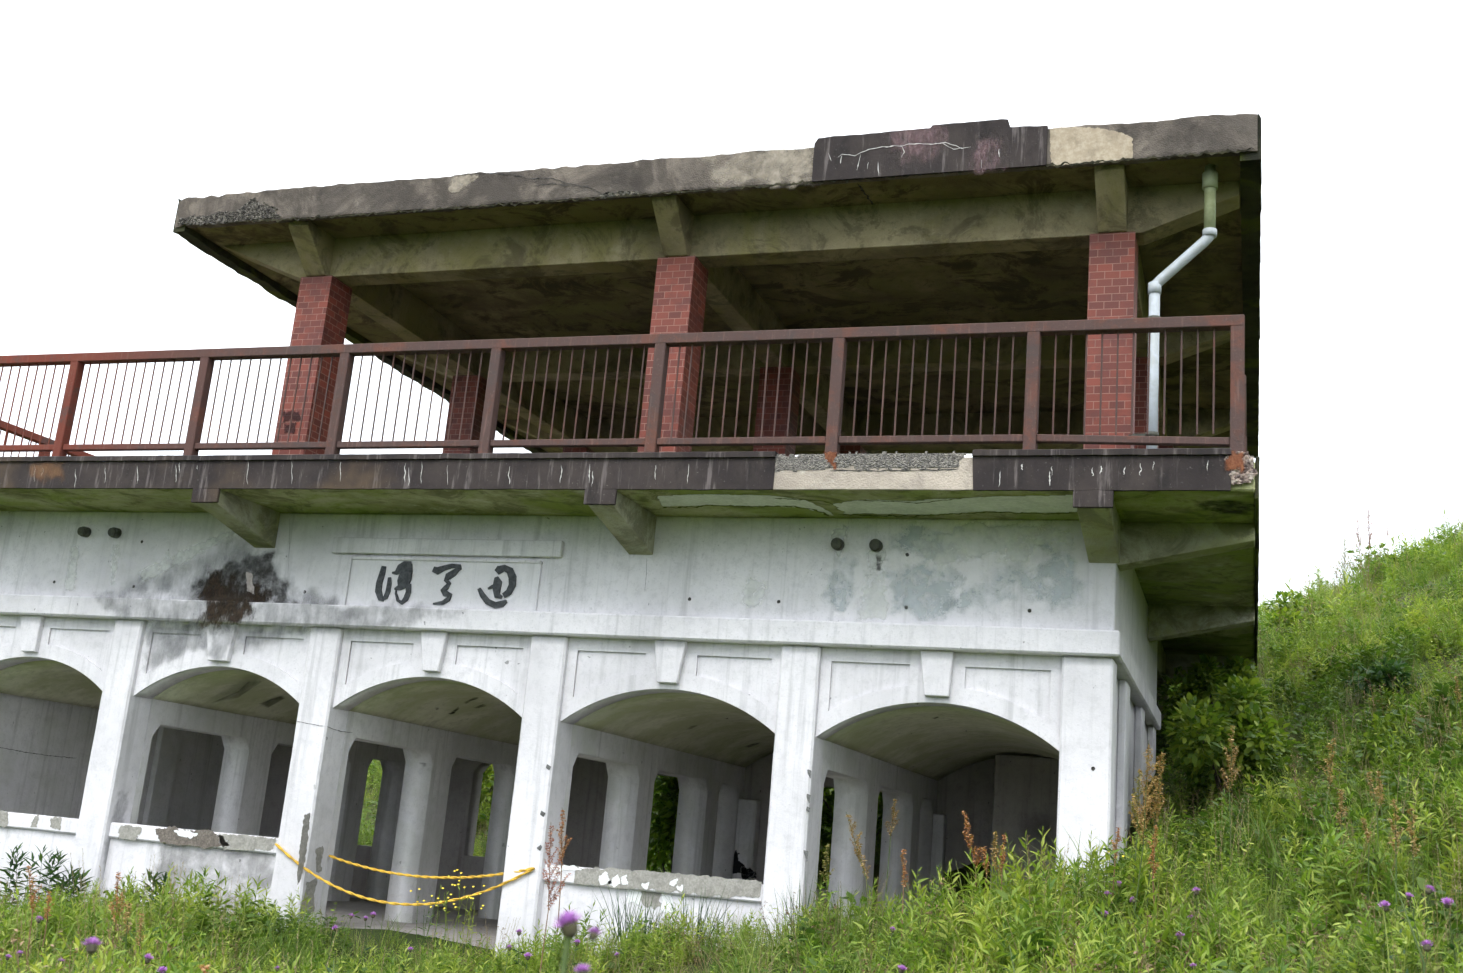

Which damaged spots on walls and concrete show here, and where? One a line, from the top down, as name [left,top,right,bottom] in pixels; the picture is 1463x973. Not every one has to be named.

spalling [178,198,280,225]
spalling [775,451,967,473]
spalling [1224,451,1258,485]
damp [159,553,296,657]
peeling [118,825,276,851]